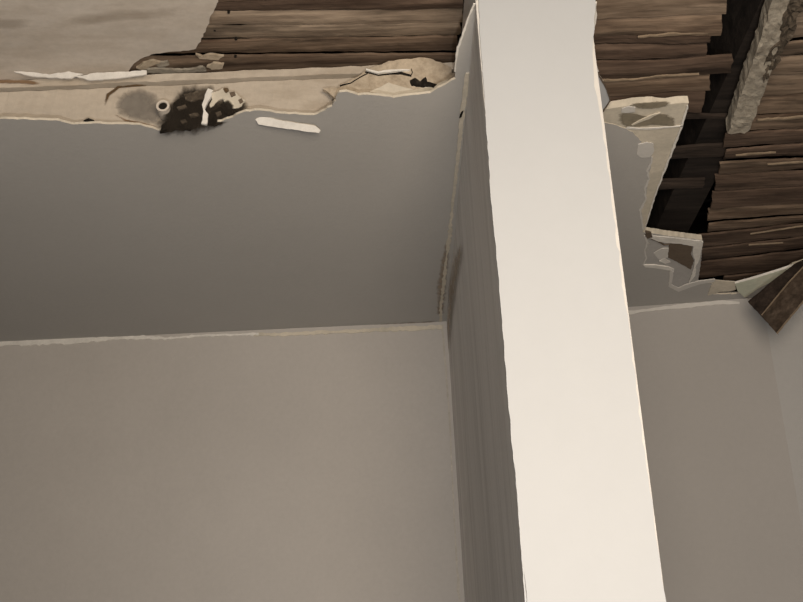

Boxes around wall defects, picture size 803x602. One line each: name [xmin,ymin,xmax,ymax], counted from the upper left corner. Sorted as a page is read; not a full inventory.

spalling [763,0,803,82]
peeling [14,70,147,81]
flaking render [323,57,452,99]
leakage [105,84,160,125]
peeling [201,88,245,126]
peeling [255,117,321,133]
peeling [597,67,736,296]